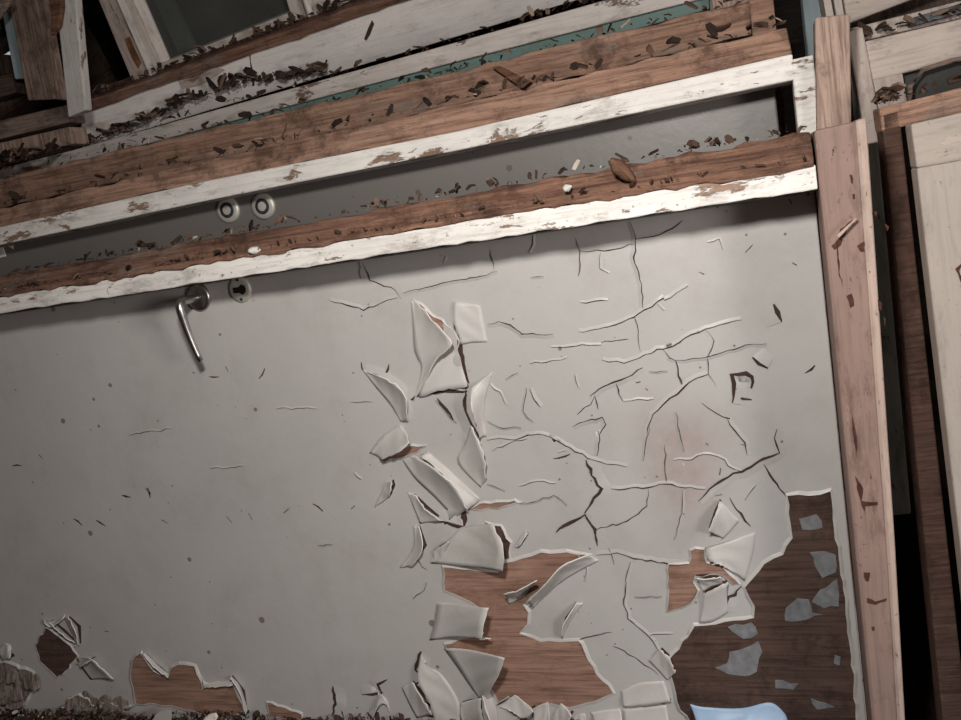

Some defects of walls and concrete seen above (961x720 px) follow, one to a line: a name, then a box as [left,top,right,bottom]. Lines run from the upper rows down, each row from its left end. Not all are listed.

crack [329,250,498,311]
crack [361,220,787,670]
peeling [363,299,860,720]
peeling [0,615,249,720]
peeling [266,701,303,720]